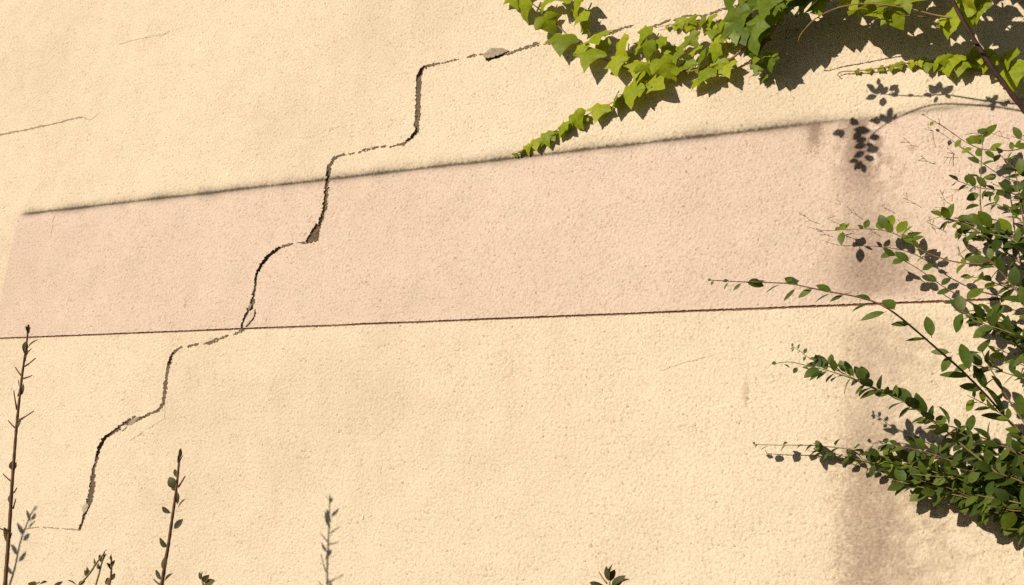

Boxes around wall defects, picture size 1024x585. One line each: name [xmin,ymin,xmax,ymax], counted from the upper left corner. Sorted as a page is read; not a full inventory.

crack [605,5,737,36]
crack [21,42,550,532]